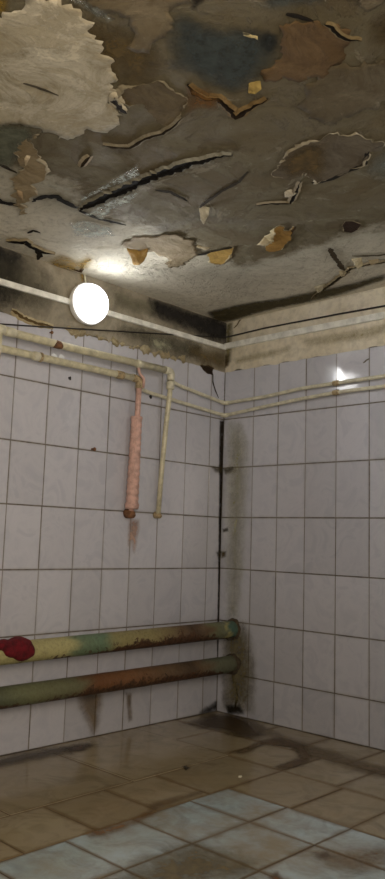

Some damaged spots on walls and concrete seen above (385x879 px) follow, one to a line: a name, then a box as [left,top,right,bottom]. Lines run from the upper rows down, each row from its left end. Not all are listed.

peeling [260,20,351,83]
peeling [0,0,191,215]
peeling [271,132,385,184]
peeling [121,234,234,268]
peeling [199,206,210,224]
peeling [257,225,296,252]
peeling [342,221,361,233]